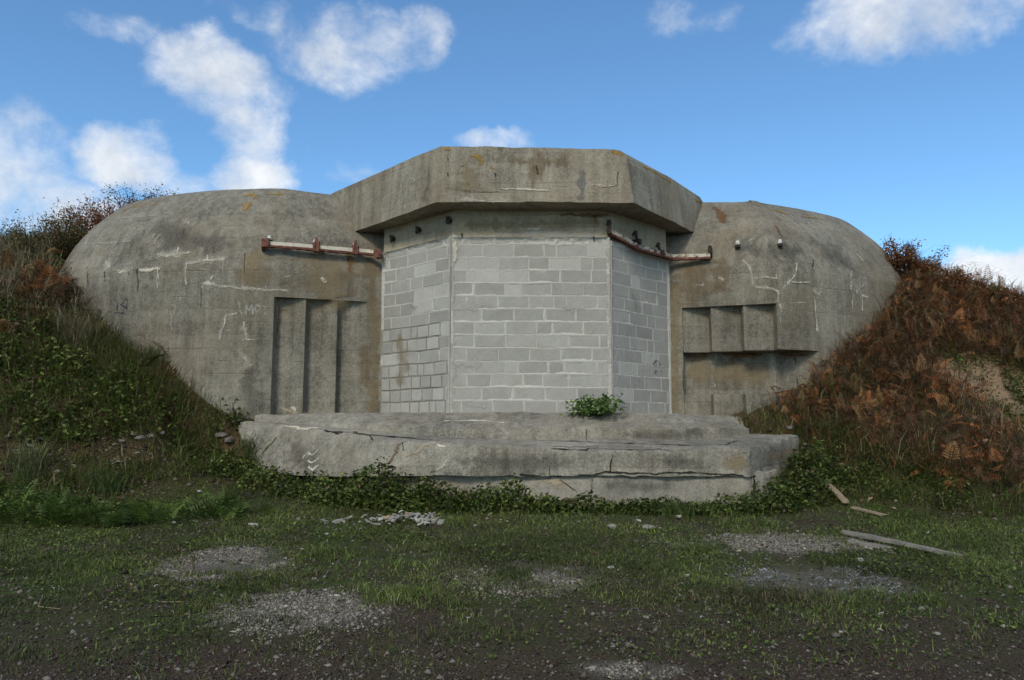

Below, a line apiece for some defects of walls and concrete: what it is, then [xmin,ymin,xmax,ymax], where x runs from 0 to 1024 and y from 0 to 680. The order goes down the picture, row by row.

crack [520,429,756,494]